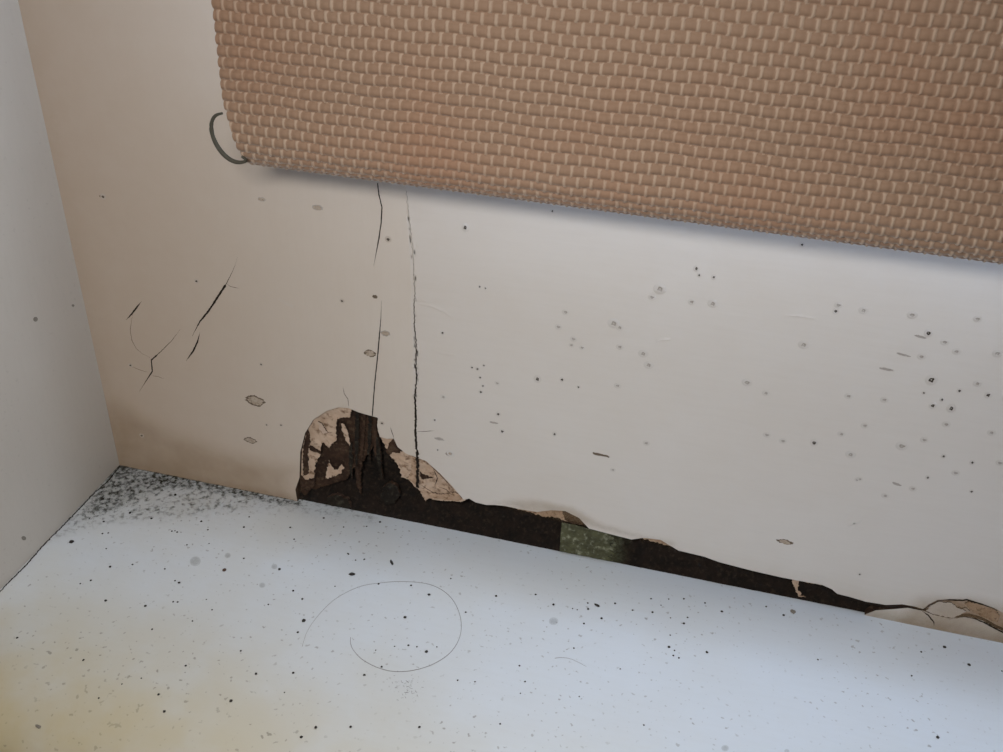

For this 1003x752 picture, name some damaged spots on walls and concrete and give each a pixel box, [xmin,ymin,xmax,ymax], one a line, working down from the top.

crack [126,266,236,387]
crack [343,183,452,493]
leakage [83,465,303,513]
spalling [299,433,1003,633]